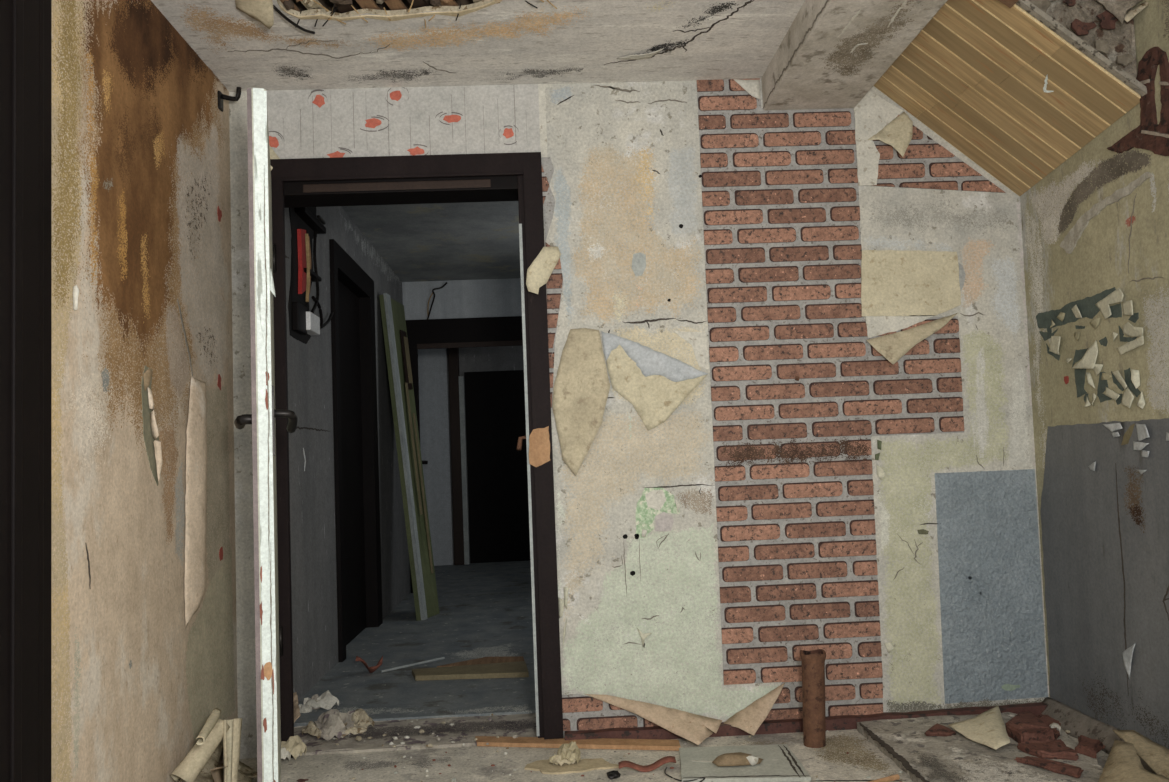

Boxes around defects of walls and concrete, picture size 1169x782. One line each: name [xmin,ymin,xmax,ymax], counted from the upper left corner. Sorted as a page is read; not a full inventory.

spalling [235,0,502,30]
crack [557,0,754,136]
leakage [52,0,590,566]
peeling [1036,287,1145,409]
peeling [143,368,162,483]
peeling [1103,423,1149,474]
crack [1161,586,1169,621]